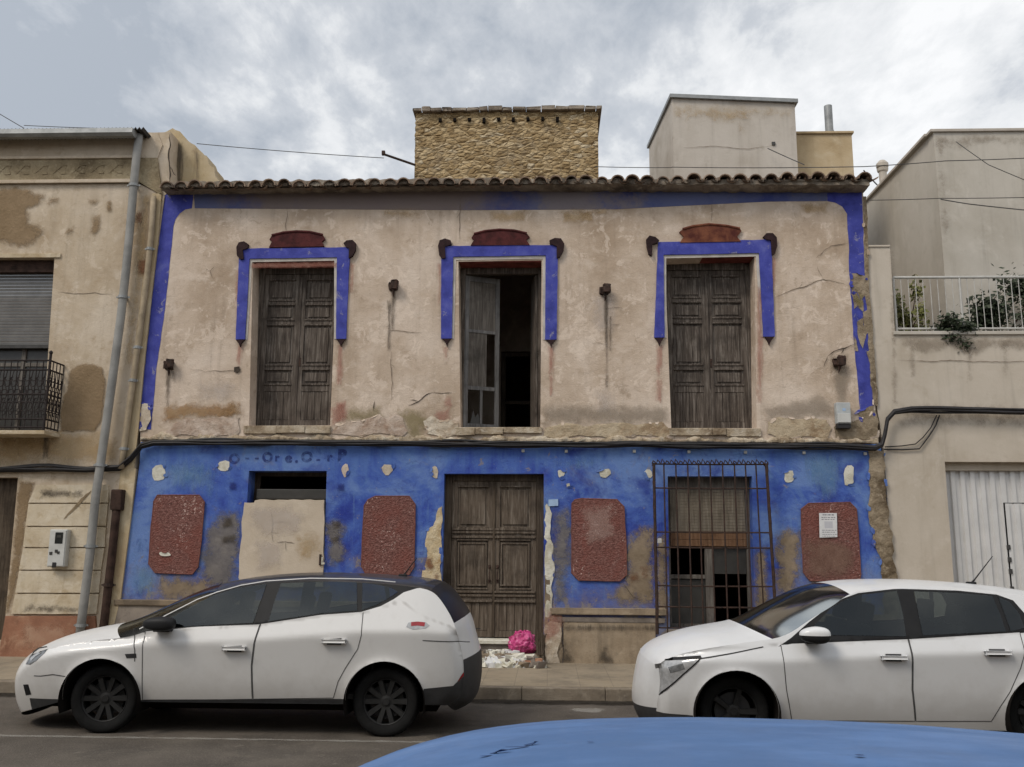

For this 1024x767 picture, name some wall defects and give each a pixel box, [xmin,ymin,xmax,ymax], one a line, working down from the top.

flaking render [0,187,57,247]
crack [777,243,847,297]
peeling [139,402,152,431]
damp [164,373,236,421]
flaking render [332,414,407,437]
crack [373,313,442,410]
flaking render [423,416,458,438]
flaking render [767,196,898,579]
peeling [422,506,443,581]
peeling [522,498,571,663]